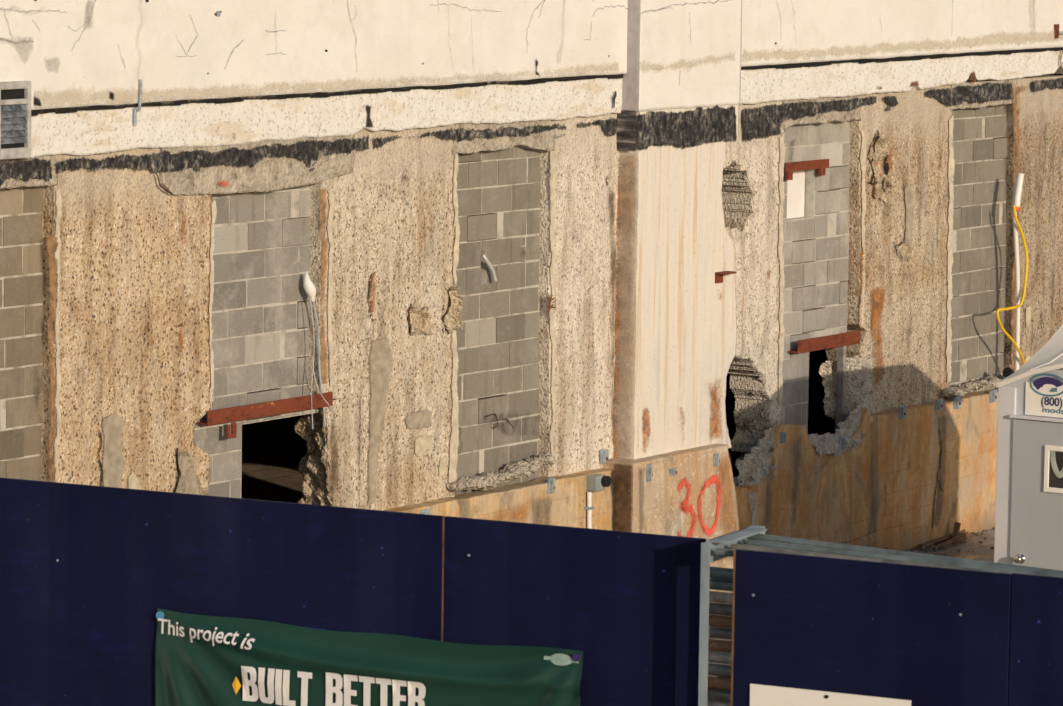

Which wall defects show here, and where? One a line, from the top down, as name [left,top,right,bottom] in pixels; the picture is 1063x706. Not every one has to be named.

crack [0,0,96,50]
peeling [0,105,566,187]
peeling [579,87,898,151]
spalling [867,133,894,203]
rust [859,249,885,383]
spalling [294,407,337,507]
rust [711,387,721,437]
spalling [734,372,779,488]